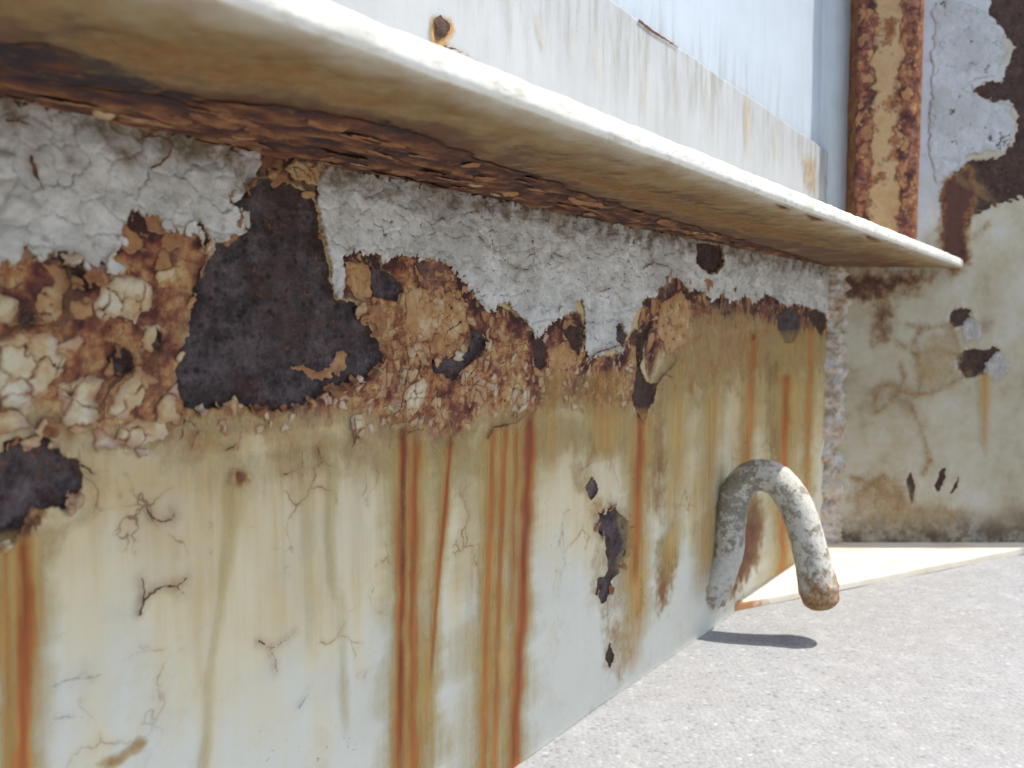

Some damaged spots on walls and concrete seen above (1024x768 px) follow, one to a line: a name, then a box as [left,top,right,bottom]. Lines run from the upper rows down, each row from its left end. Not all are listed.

peeling [0,94,297,275]
corrosion [431,15,456,48]
peeling [308,120,830,361]
corrosion [853,0,878,221]
corrosion [894,0,922,239]
peeling [927,0,1016,183]
crack [146,507,175,522]
crack [139,578,187,616]
crack [283,419,367,475]
corrosion [0,155,828,768]